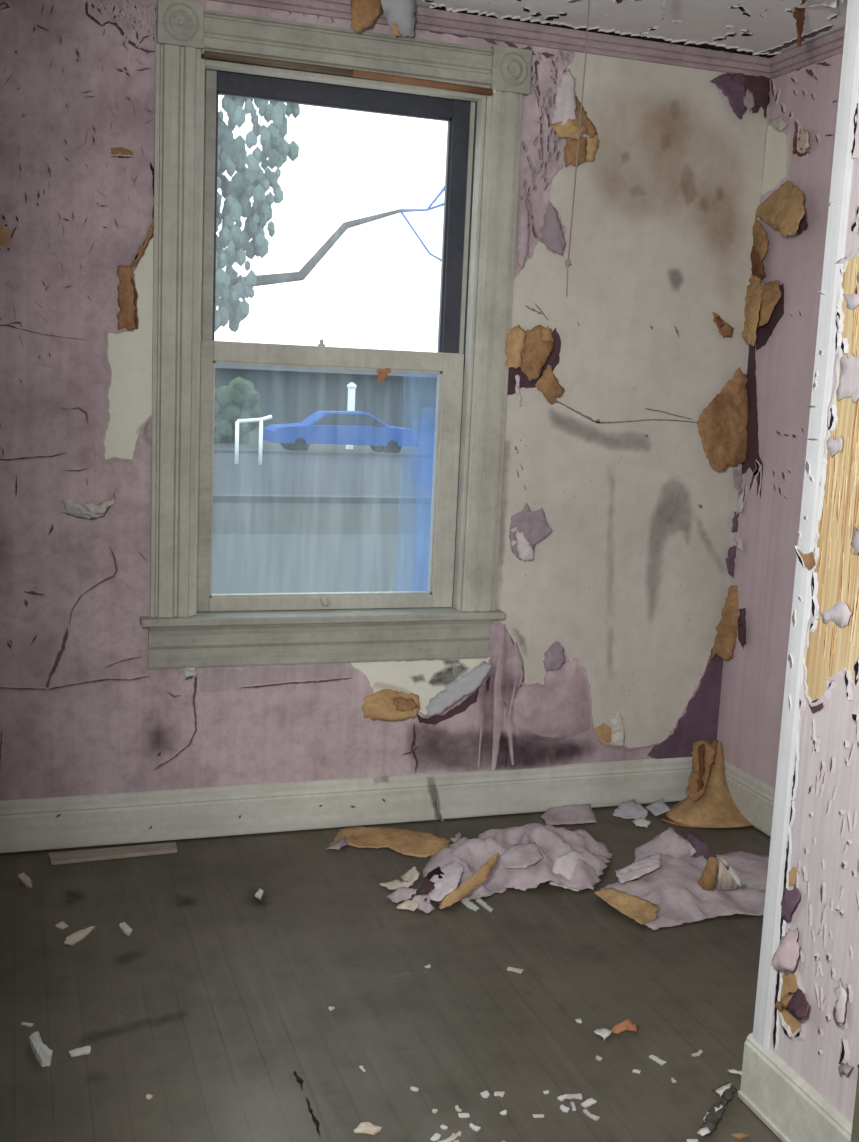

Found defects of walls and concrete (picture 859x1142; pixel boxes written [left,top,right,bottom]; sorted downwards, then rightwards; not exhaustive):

spalling [712,4,769,41]
peeling [785,0,844,47]
flaking render [104,237,153,460]
crack [60,406,90,425]
flaking render [482,39,843,747]
crack [0,451,90,499]
crack [47,524,55,536]
crack [0,546,199,772]
flaking render [350,657,489,715]
peeling [771,210,859,1076]
leakage [479,735,531,755]
crack [292,1071,321,1138]